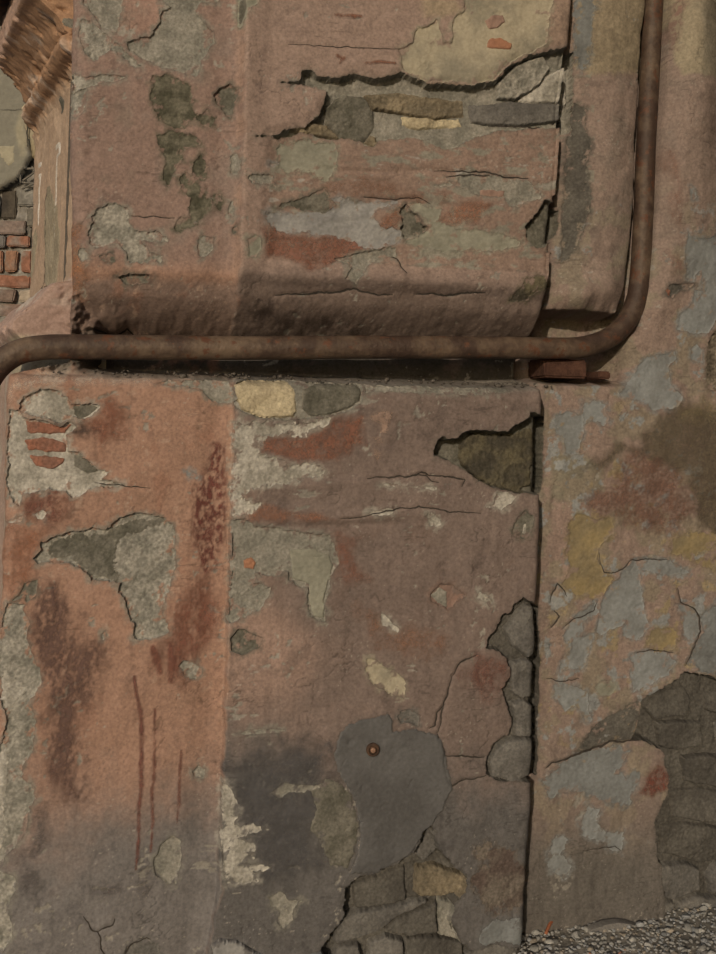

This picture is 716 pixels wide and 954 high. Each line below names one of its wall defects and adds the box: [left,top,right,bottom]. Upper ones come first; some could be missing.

flaking render [248,0,596,284]
flaking render [6,388,124,523]
flaking render [33,512,176,641]
flaking render [157,379,509,655]
crack [341,505,481,519]
crack [367,471,466,486]
flaking render [433,412,544,510]
corrosion [133,676,156,870]
water stain [238,750,321,876]
crack [429,654,486,787]
flaking render [485,558,716,912]
crack [83,916,151,954]